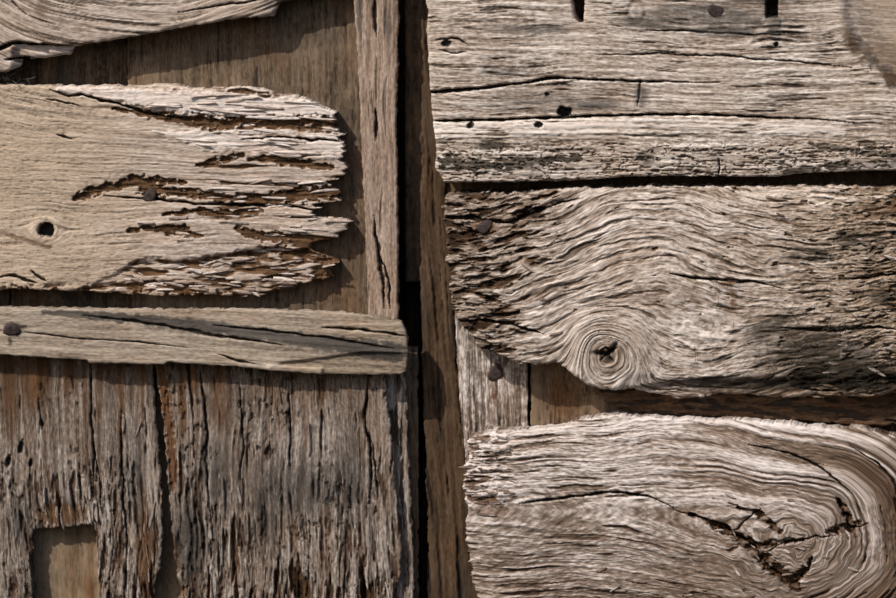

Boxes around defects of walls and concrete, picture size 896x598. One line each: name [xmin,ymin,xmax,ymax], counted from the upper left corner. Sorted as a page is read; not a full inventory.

crack [0,271,47,283]
crack [104,195,316,211]
crack [374,217,391,308]
crack [90,367,128,586]
crack [200,373,213,534]
crack [25,315,405,493]
crack [524,445,865,582]